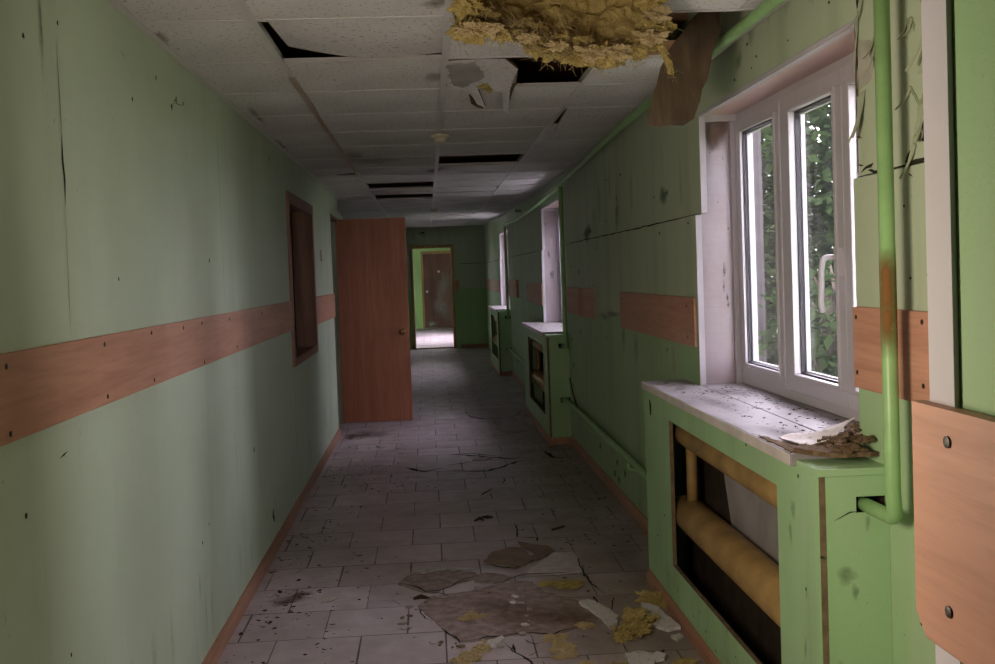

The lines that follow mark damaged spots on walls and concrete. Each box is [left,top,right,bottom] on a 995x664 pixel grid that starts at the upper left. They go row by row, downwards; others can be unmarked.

flaking render [841,0,874,142]
peeling [897,16,923,74]
peeling [894,85,924,144]
crack [409,452,564,496]
crack [384,524,614,664]
spalling [397,570,601,650]